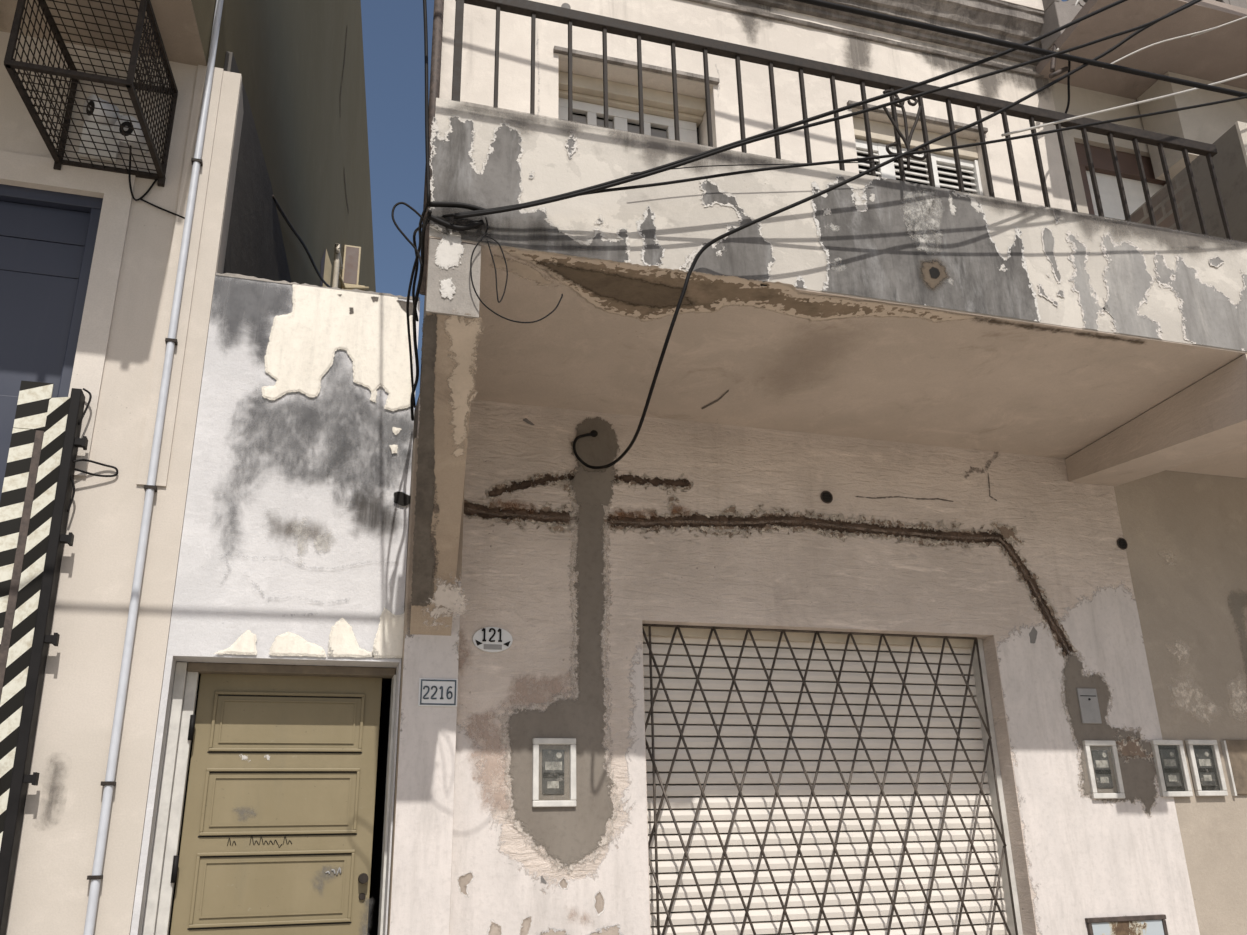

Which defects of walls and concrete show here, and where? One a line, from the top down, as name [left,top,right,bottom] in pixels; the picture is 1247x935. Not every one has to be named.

peeling [429,116,1247,457]
damp [211,275,291,358]
peeling [262,284,413,411]
damp [237,356,414,531]
peeling [389,427,402,454]
damp [274,521,321,537]
crack [431,452,1087,669]
peeling [214,607,405,658]
peeling [487,919,502,935]
peeling [520,916,570,935]
peeling [584,890,624,935]